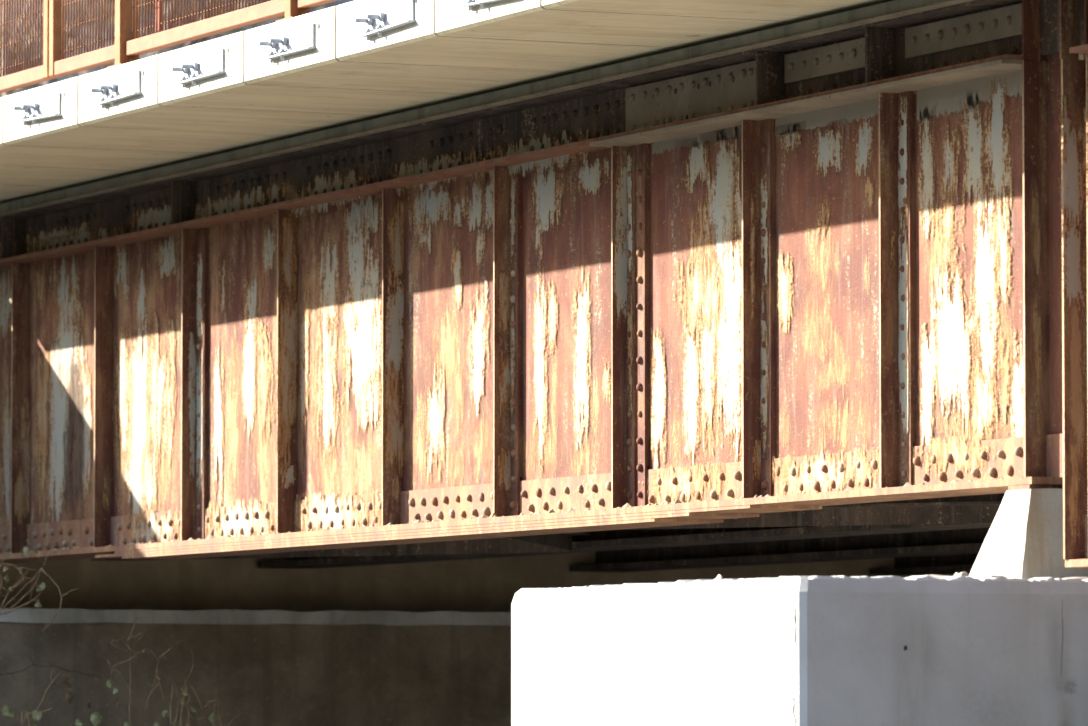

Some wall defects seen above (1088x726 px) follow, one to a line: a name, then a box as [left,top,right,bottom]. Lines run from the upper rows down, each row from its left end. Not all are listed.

peeling [1056,83,1088,317]
rust [225,326,240,500]
rust [254,401,270,503]
peeling [0,128,633,544]
rust [310,340,400,501]
rust [414,393,433,485]
rust [433,301,493,486]
rust [526,361,557,477]
rust [571,372,599,476]
rust [803,225,863,453]
rust [939,314,1009,442]
rust [1031,184,1042,444]